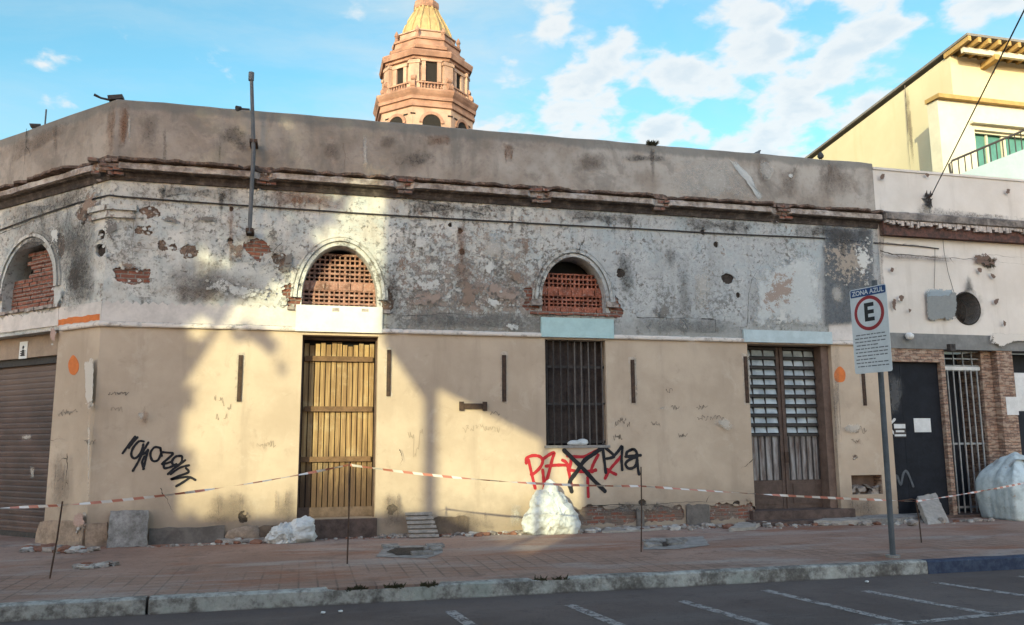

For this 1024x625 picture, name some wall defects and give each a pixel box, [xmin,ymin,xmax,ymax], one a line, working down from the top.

flaking render [76,175,151,285]
flaking render [135,205,234,259]
flaking render [205,223,303,307]
peeling [378,222,540,314]
flaking render [721,273,739,298]
peeling [754,258,800,329]
peeling [823,237,875,287]
flaking render [974,251,1000,278]
flaking render [574,499,684,528]
flaking render [709,498,756,523]